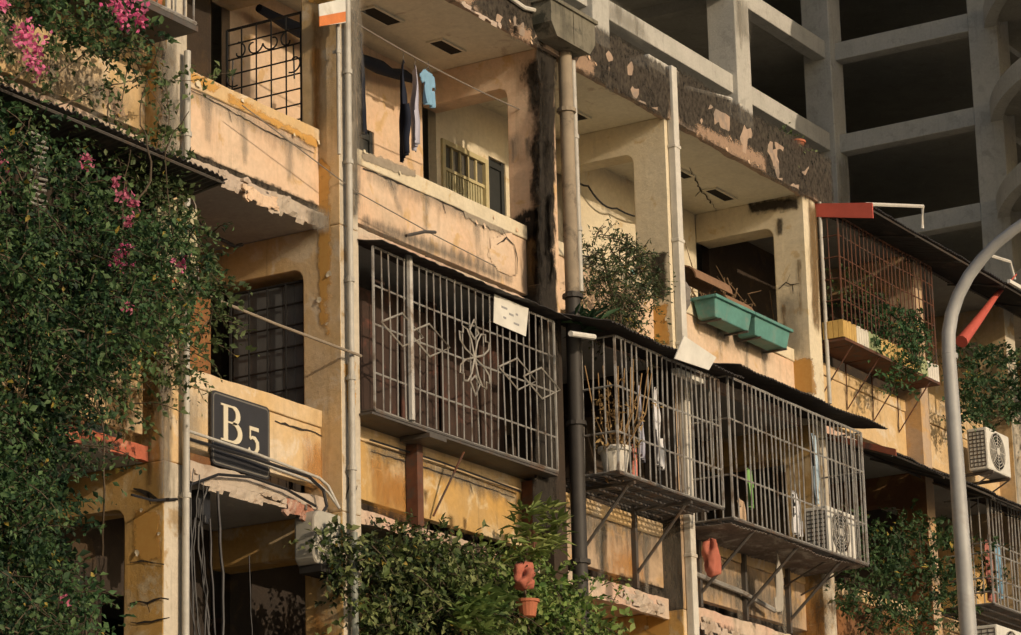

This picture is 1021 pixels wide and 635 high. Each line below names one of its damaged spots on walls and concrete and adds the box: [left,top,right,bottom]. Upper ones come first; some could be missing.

spalling [460,0,533,44]
peeling [191,72,219,93]
peeling [572,56,597,73]
peeling [697,126,766,171]
peeling [191,94,332,335]
damp [466,0,559,534]
spalling [190,469,314,522]
spalling [701,616,746,635]